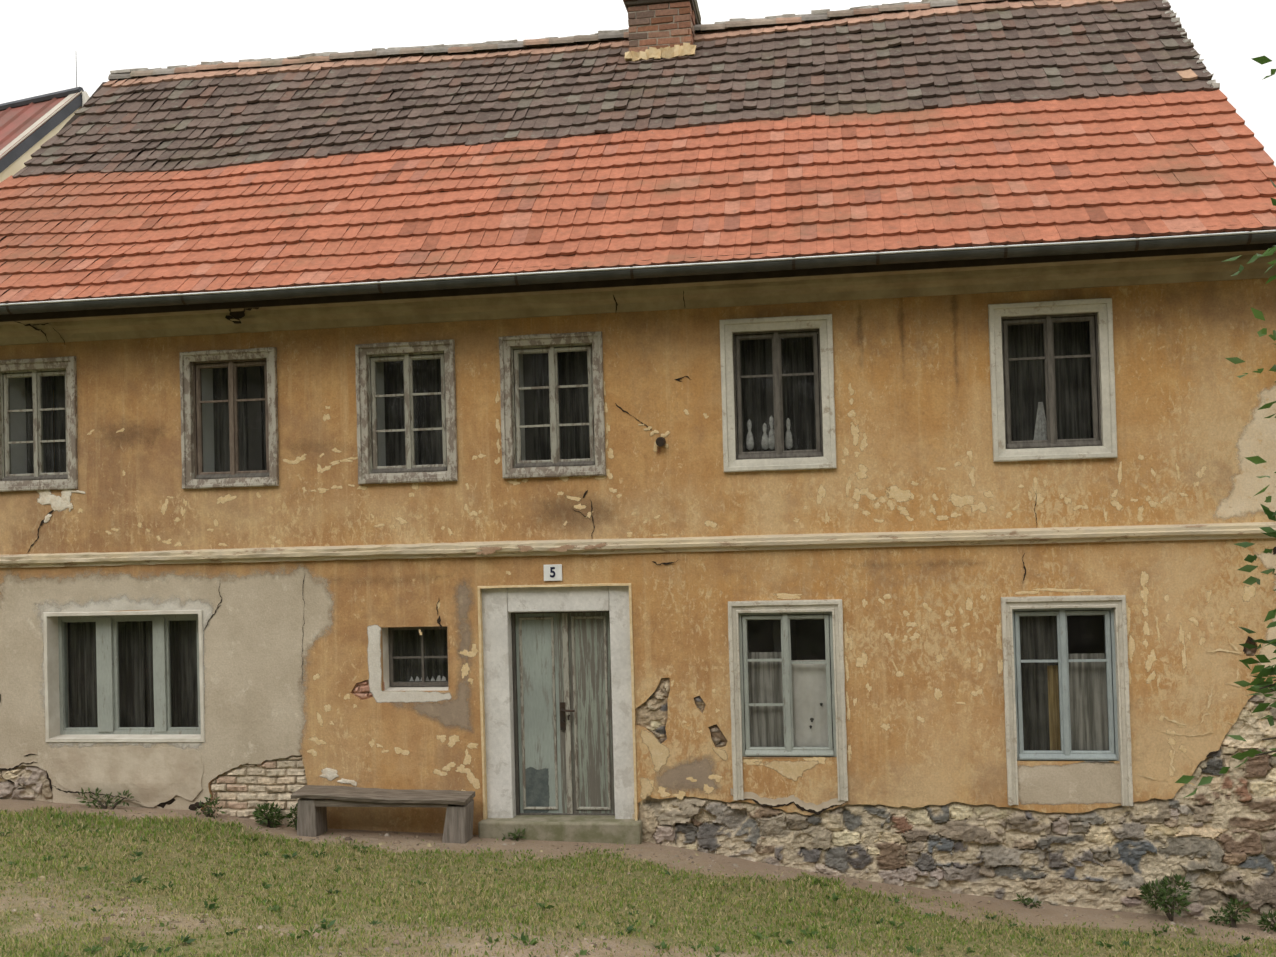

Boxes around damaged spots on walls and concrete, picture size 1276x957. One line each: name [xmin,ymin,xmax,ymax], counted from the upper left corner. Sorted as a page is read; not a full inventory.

peeling [1215,386,1276,519]
crack [28,510,54,552]
flaking render [36,489,85,523]
flaking render [0,765,53,802]
crack [0,750,139,802]
flaking render [202,680,385,825]
peeling [369,738,410,755]
flaking render [636,678,825,805]